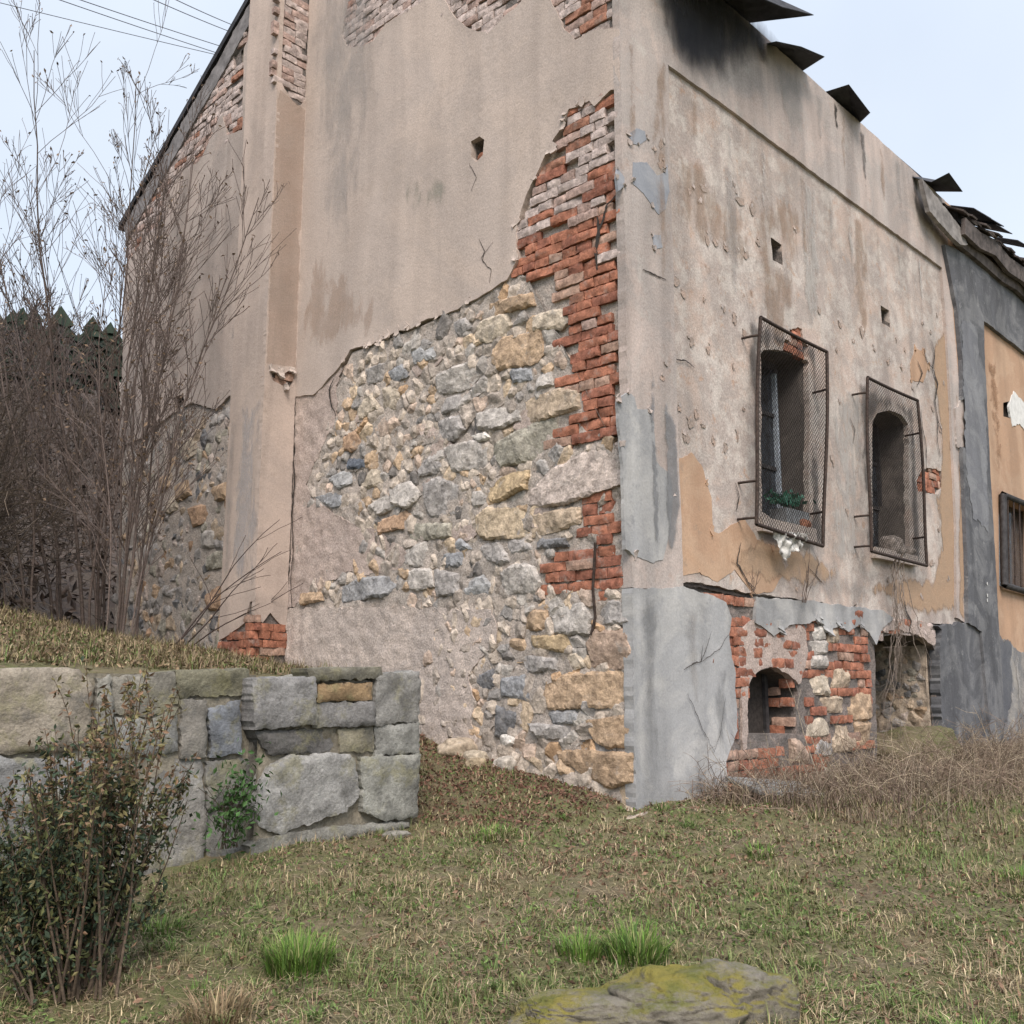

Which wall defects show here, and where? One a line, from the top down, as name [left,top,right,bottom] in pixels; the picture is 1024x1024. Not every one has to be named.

spalling [269,0,309,106]
spalling [342,0,423,53]
spalling [441,0,521,33]
spalling [551,0,613,39]
spalling [110,397,287,664]
crack [288,451,296,607]
spalling [260,93,670,804]
spalling [917,468,941,494]
spalling [700,592,936,791]